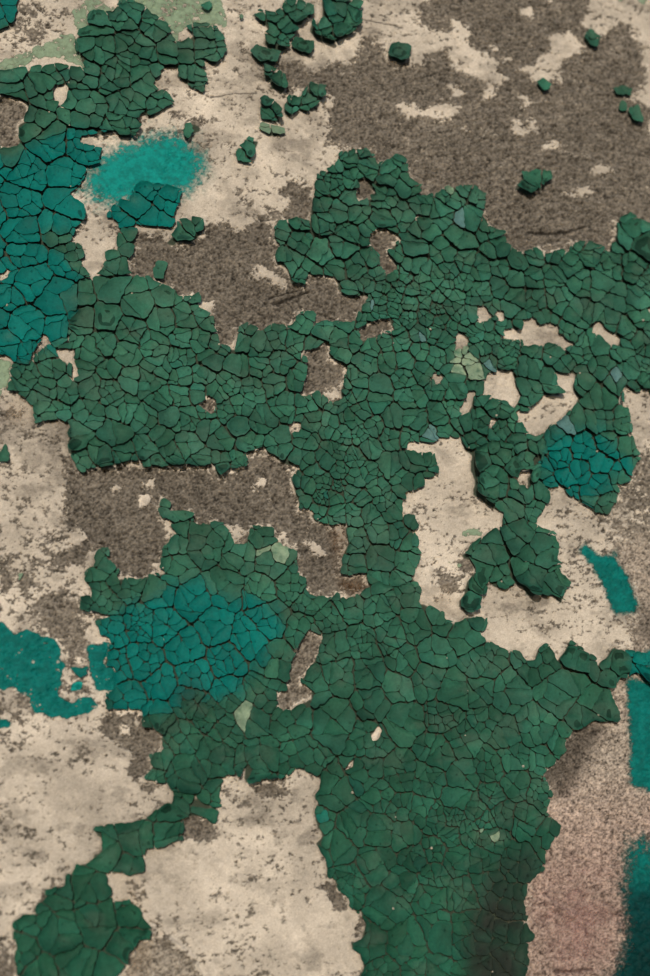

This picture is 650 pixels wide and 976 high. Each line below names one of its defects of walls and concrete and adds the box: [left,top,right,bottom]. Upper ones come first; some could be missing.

crack [527,224,588,236]
crack [268,290,311,306]
peeling [0,0,650,600]
crack [48,566,69,574]
peeling [560,640,650,688]
peeling [12,448,621,976]
crack [554,966,595,975]